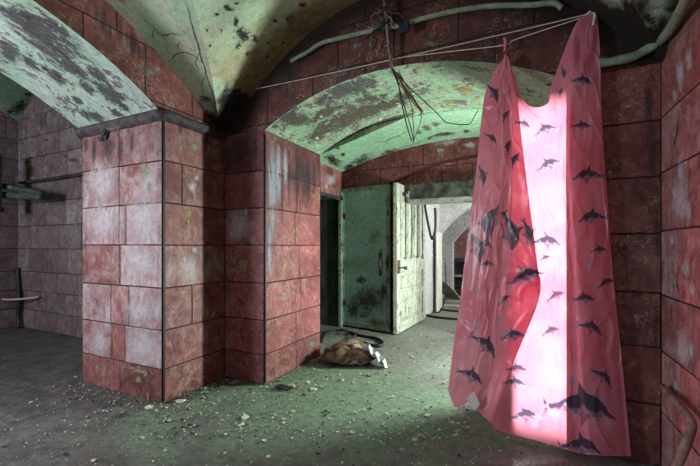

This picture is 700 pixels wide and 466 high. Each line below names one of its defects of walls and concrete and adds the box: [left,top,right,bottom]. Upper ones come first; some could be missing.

crack [145,5,218,113]
damp [315,76,378,107]
damp [268,149,287,273]